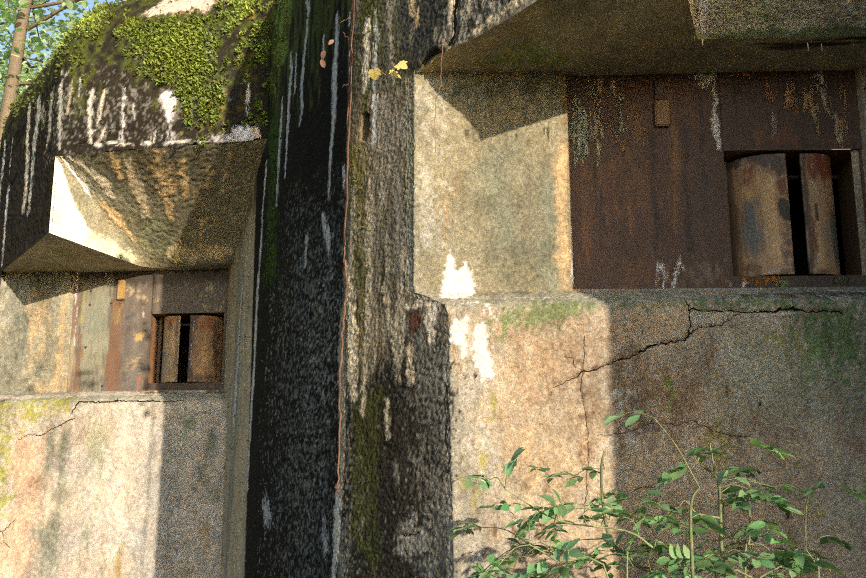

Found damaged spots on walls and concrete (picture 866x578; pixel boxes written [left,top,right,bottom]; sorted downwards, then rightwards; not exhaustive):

water stain [0,139,13,266]
water stain [21,71,237,254]
water stain [232,0,310,472]
water stain [323,13,350,196]
water stain [362,1,395,146]
water stain [409,0,419,27]
rust [569,75,627,165]
rust [785,84,848,147]
crack [18,399,186,440]
water stain [322,167,415,578]
water stain [424,254,495,382]
crack [553,299,843,512]